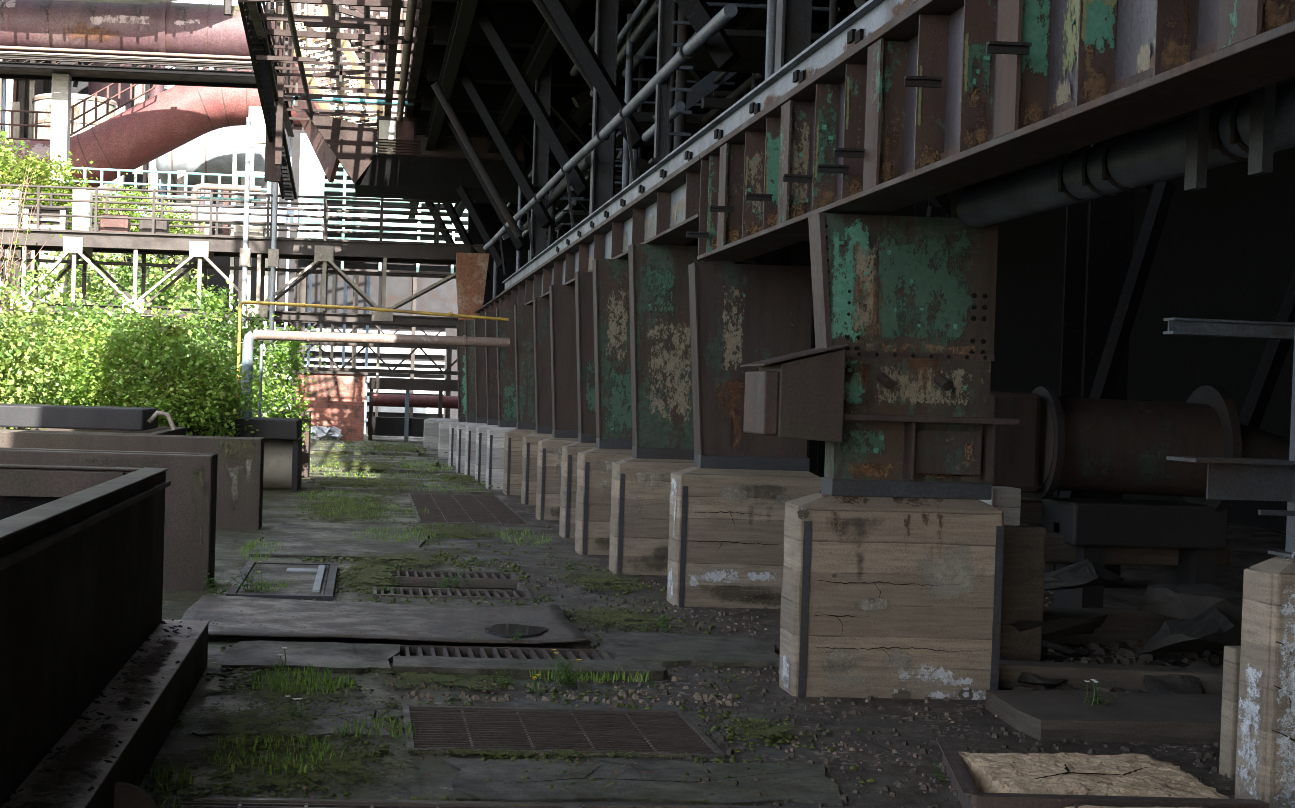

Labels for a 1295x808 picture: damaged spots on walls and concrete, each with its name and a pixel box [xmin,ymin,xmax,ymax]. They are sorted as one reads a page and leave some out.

peeling [1019,0,1117,125]
peeling [585,264,693,434]
crack [1035,764,1147,779]
efflorescence [1236,585,1295,808]